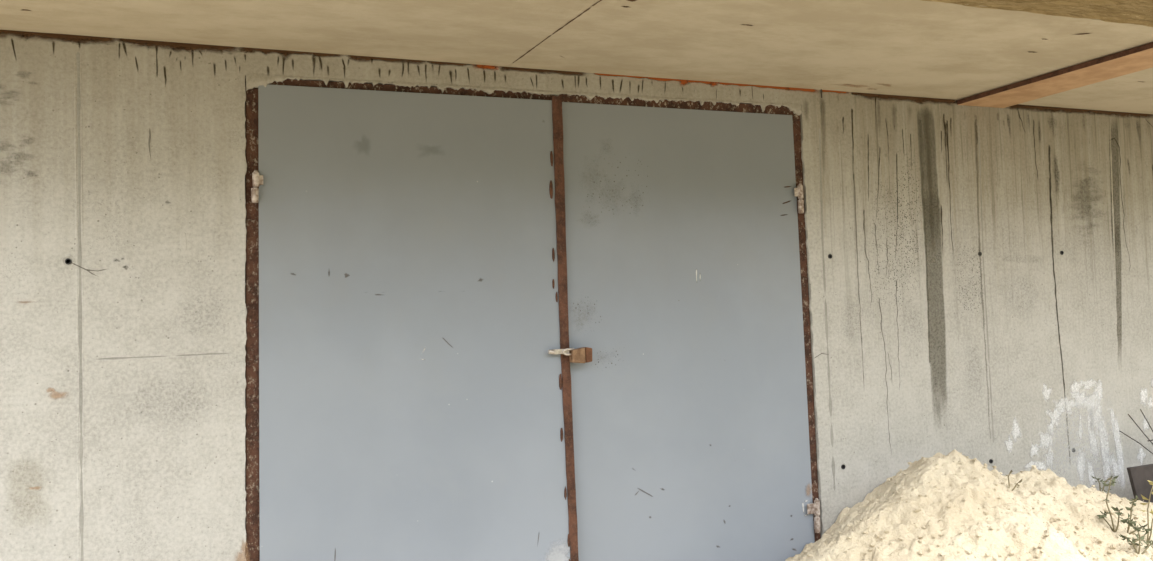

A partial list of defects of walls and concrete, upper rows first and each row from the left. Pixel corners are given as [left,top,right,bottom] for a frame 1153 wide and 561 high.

leakage [155,46,202,85]
corrosion [0,0,957,105]
leakage [868,97,981,397]
crack [1017,107,1070,460]
leakage [1006,379,1144,487]
leakage [1140,380,1153,430]